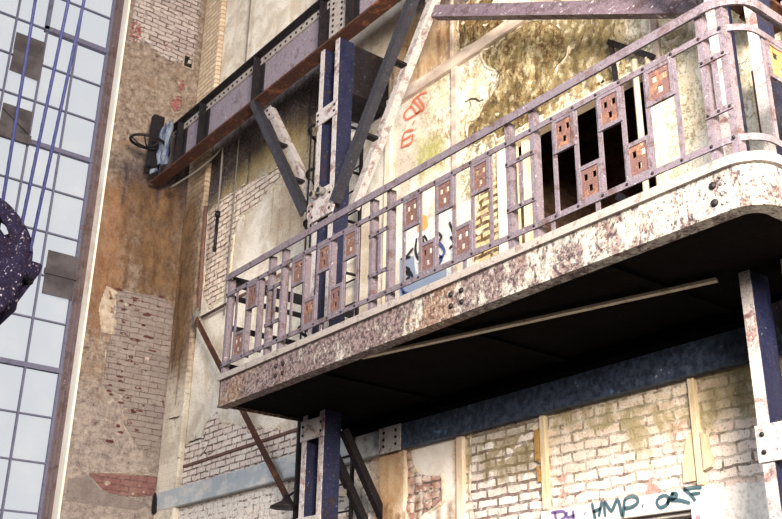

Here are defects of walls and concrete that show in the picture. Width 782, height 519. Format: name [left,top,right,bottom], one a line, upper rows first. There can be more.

flaking render [129,0,201,65]
spalling [456,20,504,50]
spalling [611,19,630,72]
peeling [662,23,689,47]
spalling [465,20,571,147]
damp [122,166,196,373]
spalling [203,167,282,310]
spalling [99,286,173,451]
rust [378,450,406,519]
spalling [406,450,446,519]